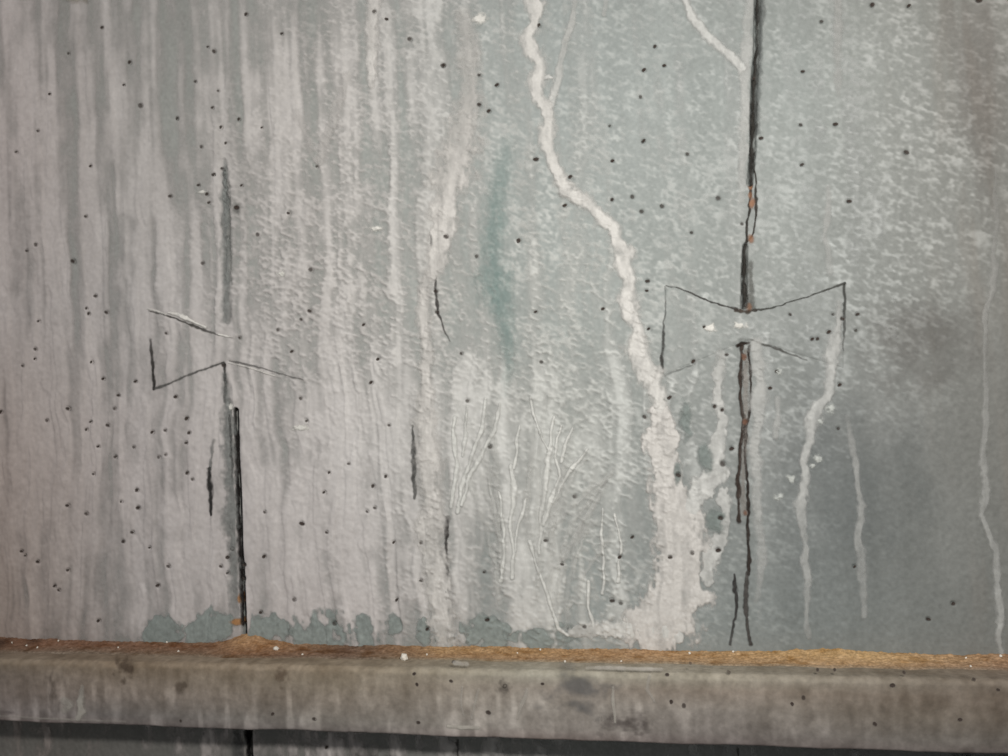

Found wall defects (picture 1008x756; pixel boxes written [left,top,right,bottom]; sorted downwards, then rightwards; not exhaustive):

efflorescence [364,0,381,88]
efflorescence [682,0,754,171]
crack [741,0,760,308]
crack [207,363,246,625]
leakage [414,59,500,647]
leakage [489,0,732,651]
crack [729,342,753,646]
efflorescence [750,339,766,518]
efflorescence [787,309,842,588]
efflorescence [854,460,864,550]
efflorescence [979,398,1004,654]